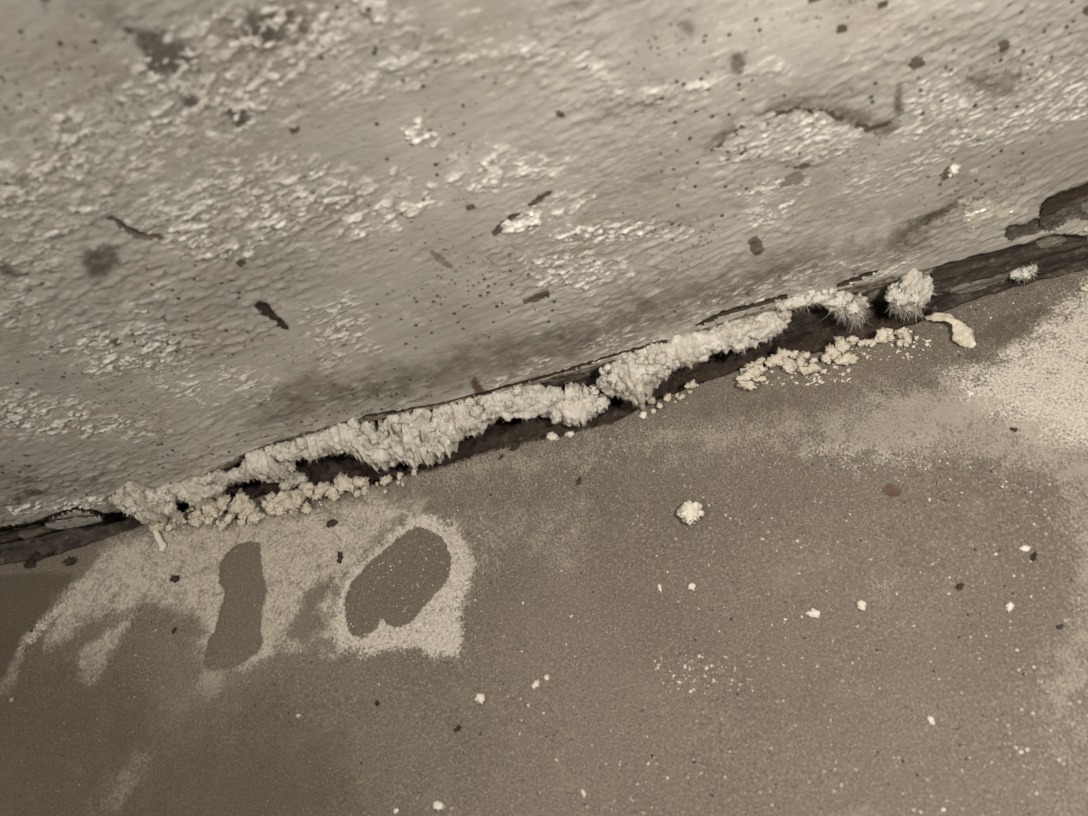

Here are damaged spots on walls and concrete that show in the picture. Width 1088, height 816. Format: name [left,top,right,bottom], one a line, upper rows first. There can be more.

peeling [947,163,962,178]
crack [430,250,453,268]
crack [837,271,877,288]
peeling [922,183,1088,349]
crack [696,294,788,327]
crack [362,340,667,418]
damp [0,268,938,701]
crack [0,507,126,546]